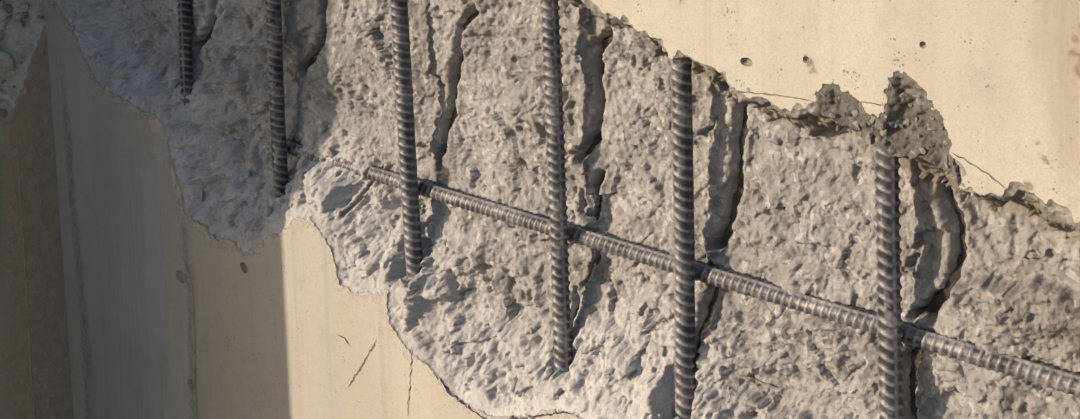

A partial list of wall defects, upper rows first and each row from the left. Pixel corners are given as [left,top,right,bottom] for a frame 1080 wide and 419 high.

spalling [0,0,46,120]
spalling [52,0,680,419]
spalling [670,50,1080,419]